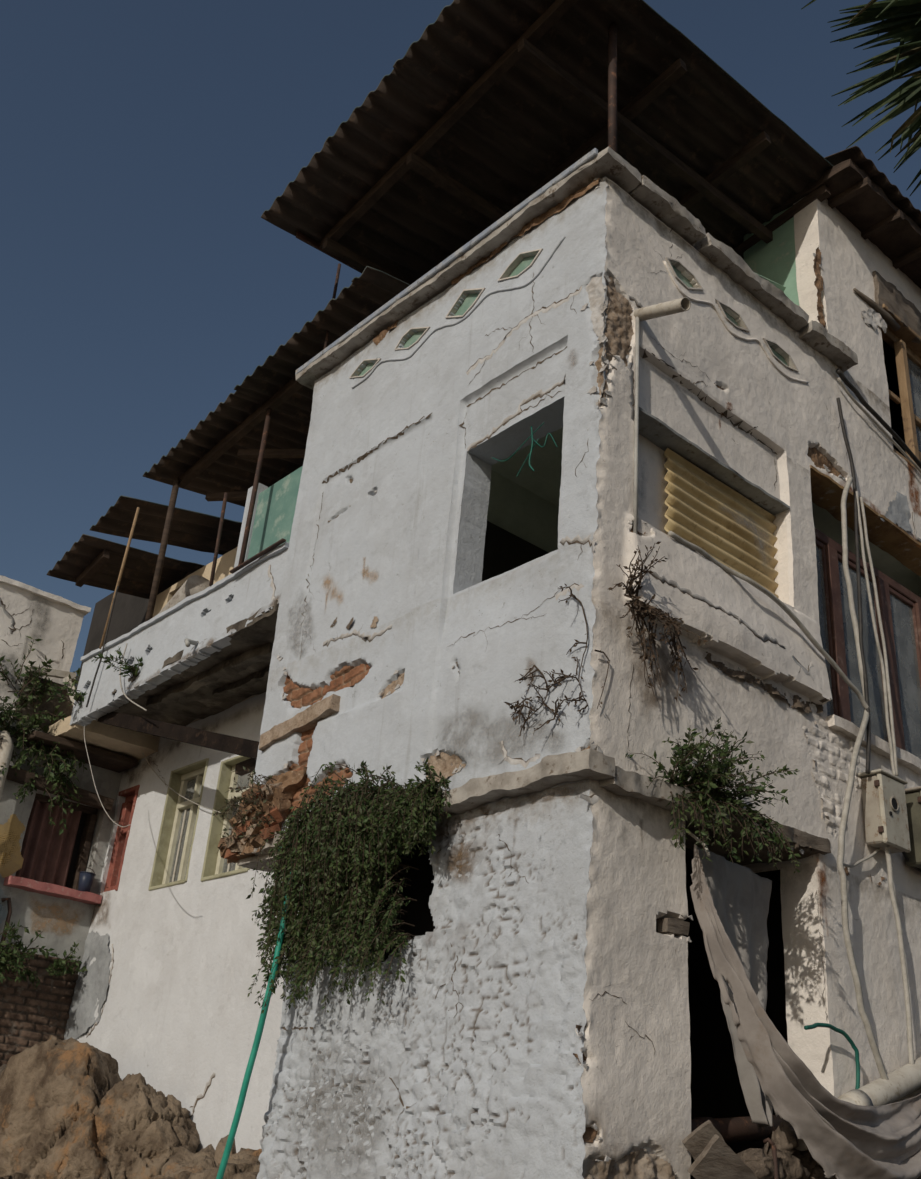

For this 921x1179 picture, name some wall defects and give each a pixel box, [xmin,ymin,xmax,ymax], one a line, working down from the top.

crack [459,268,643,451]
spalling [580,275,634,406]
crack [626,336,778,488]
spalling [813,245,826,328]
crack [0,598,34,647]
crack [300,413,432,657]
crack [452,534,596,648]
spalling [277,655,371,709]
spalling [271,725,353,817]
peeling [704,652,874,843]
peeling [64,929,112,1040]
peeling [583,1124,602,1143]